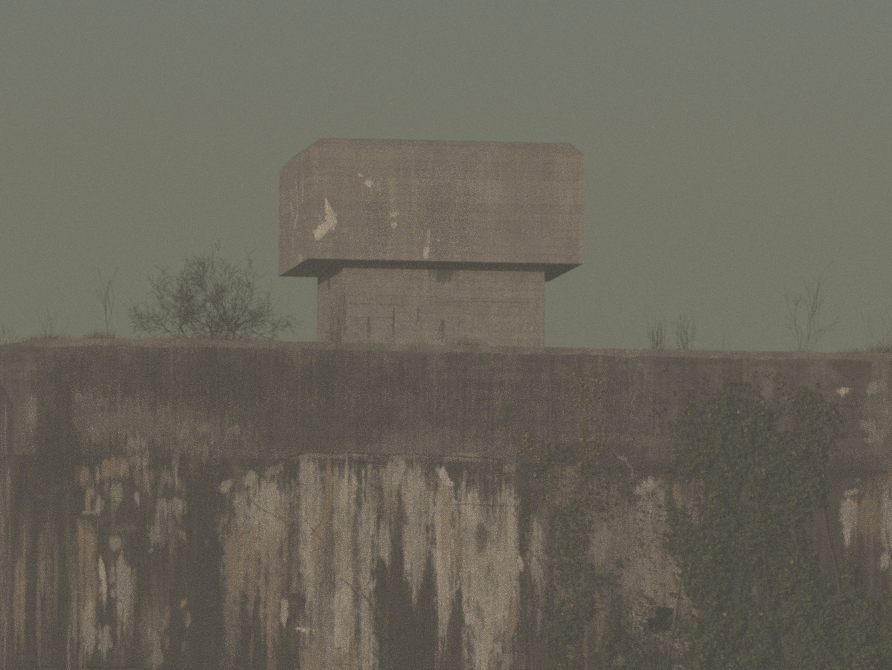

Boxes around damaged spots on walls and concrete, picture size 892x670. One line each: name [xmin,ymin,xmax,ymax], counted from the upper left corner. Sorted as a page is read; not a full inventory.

leakage [99,556,107,600]
leakage [219,457,541,670]